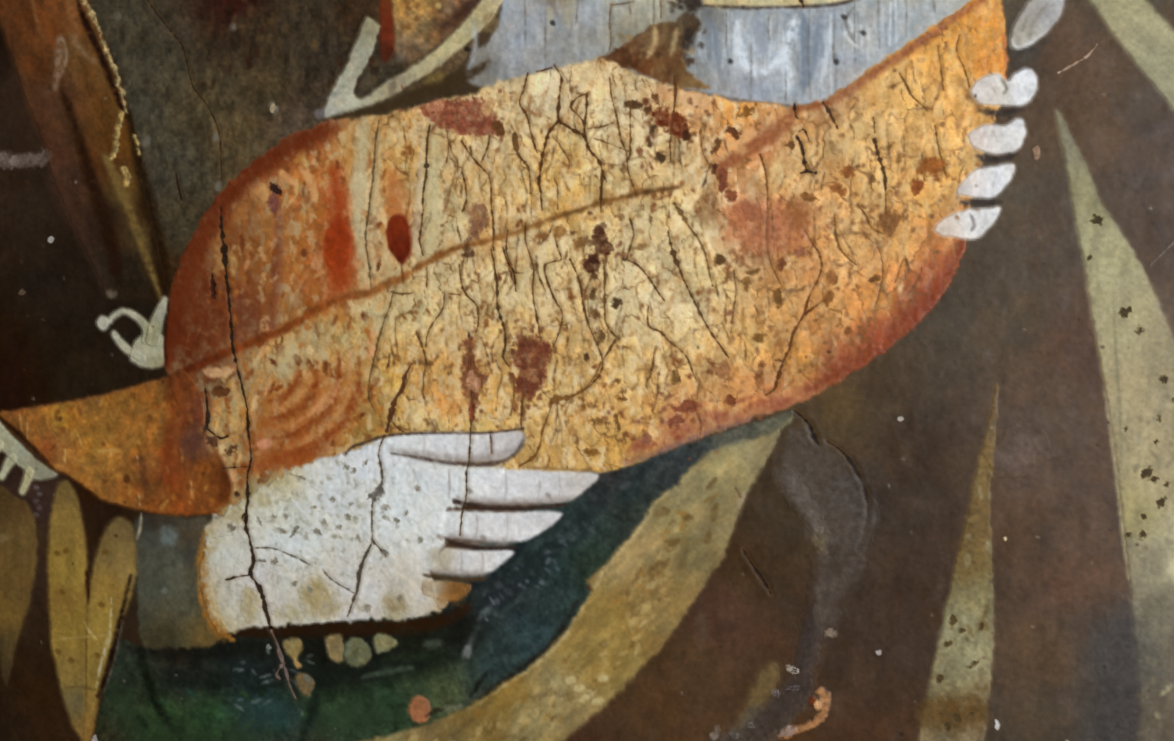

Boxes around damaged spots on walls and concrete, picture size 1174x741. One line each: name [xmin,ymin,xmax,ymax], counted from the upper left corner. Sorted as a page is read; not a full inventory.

crack [758,153,770,209]
crack [792,101,839,175]
crack [898,34,971,181]
crack [146,0,737,701]
crack [764,116,905,526]